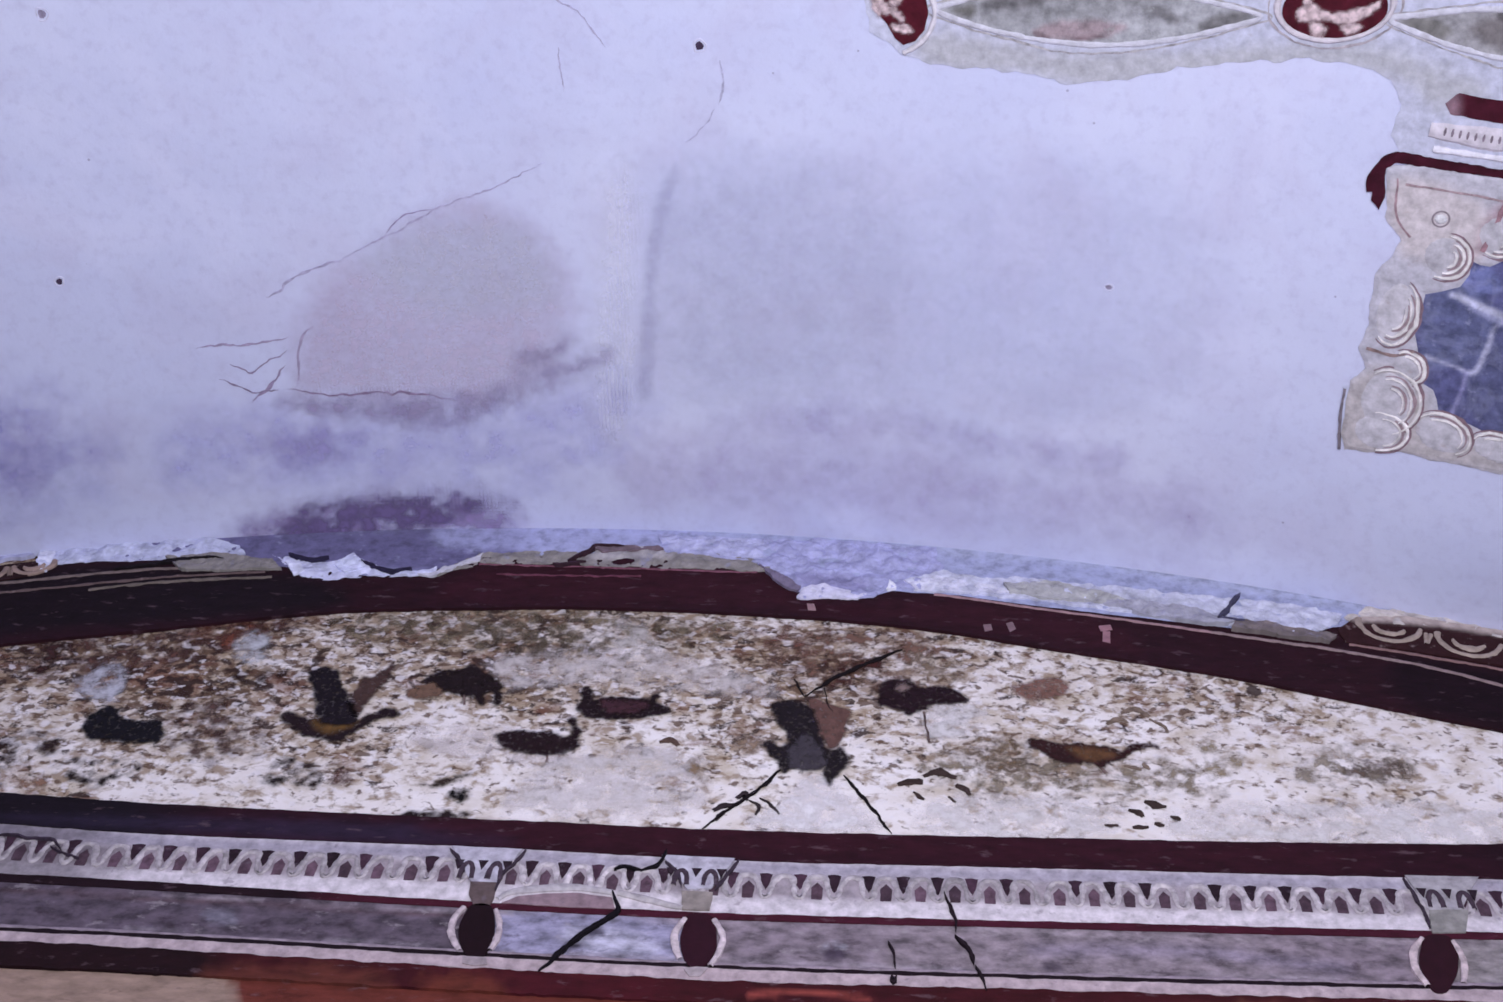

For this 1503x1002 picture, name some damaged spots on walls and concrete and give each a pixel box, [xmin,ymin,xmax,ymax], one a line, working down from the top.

crack [266,163,543,298]
leakage [196,327,454,419]
leakage [249,493,506,536]
flaking render [0,528,1503,644]
crack [794,649,903,710]
crack [702,769,781,829]
crack [843,775,892,834]
crack [538,849,667,972]
crack [944,891,987,991]